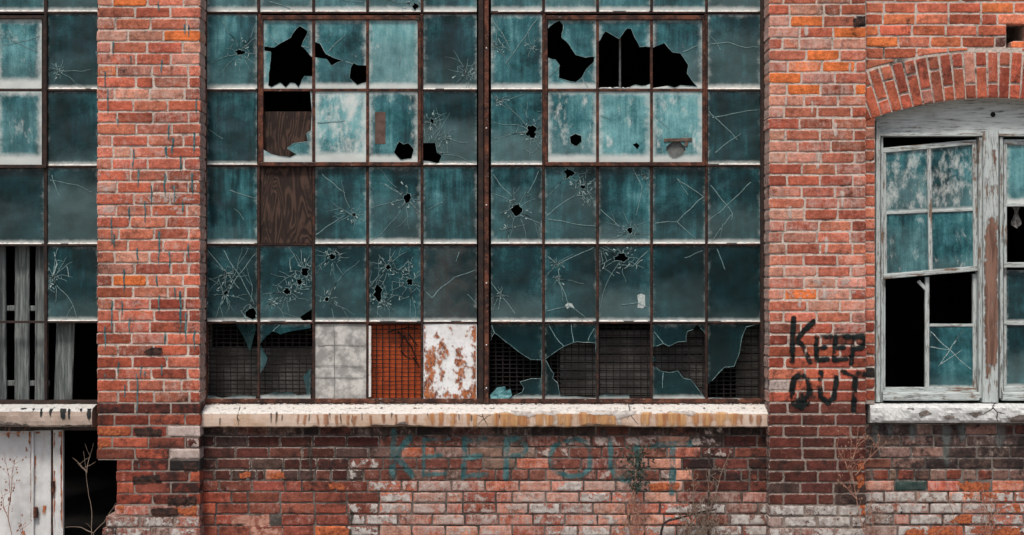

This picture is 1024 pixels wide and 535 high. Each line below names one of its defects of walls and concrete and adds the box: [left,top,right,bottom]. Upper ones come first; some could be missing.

peeling [984,217,998,379]
corrosion [423,324,477,399]
peeling [692,427,726,456]
peeling [319,460,1024,535]